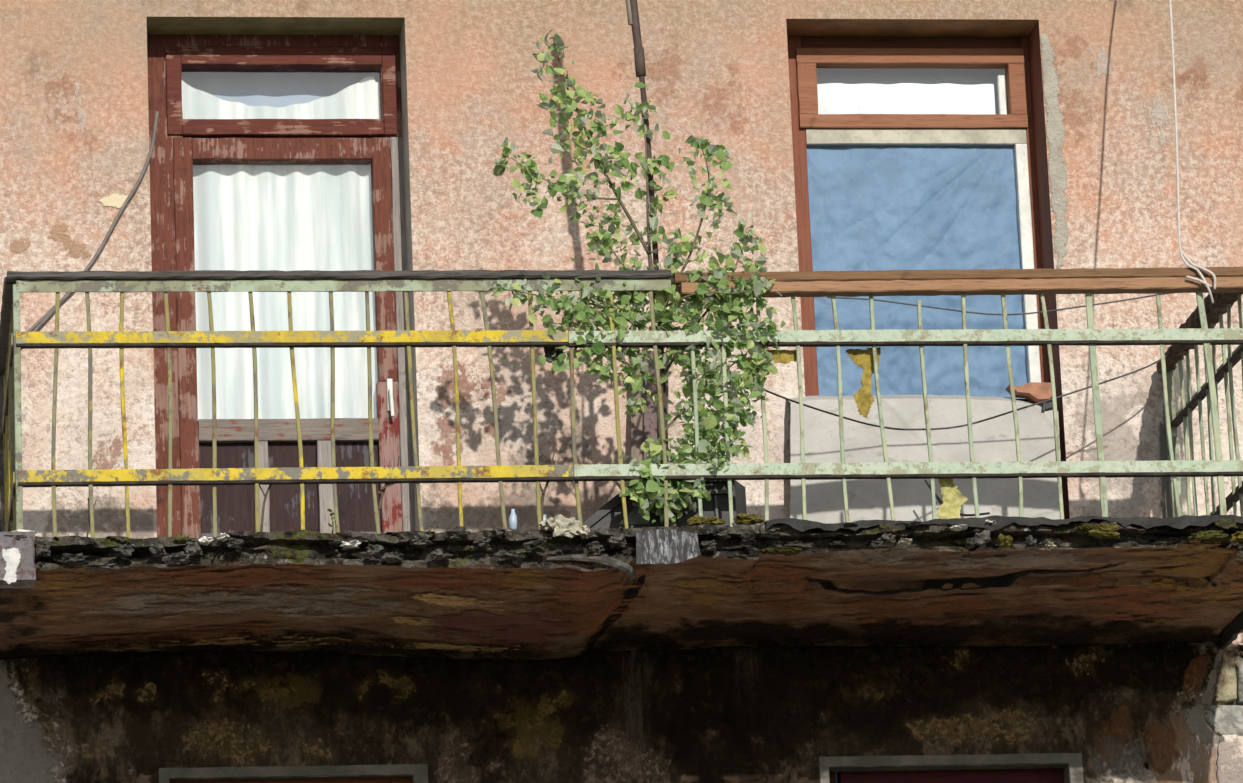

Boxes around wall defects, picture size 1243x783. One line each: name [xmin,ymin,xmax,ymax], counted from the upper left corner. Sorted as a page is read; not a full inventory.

flaking render [1041,34,1068,269]
spalling [2,529,244,584]
spalling [328,514,627,563]
spalling [699,526,813,552]
spalling [870,521,921,550]
spalling [949,520,996,550]
crack [805,556,1168,595]
spalling [1022,535,1056,551]
damp [1,635,1243,783]
flaking render [1184,644,1243,783]